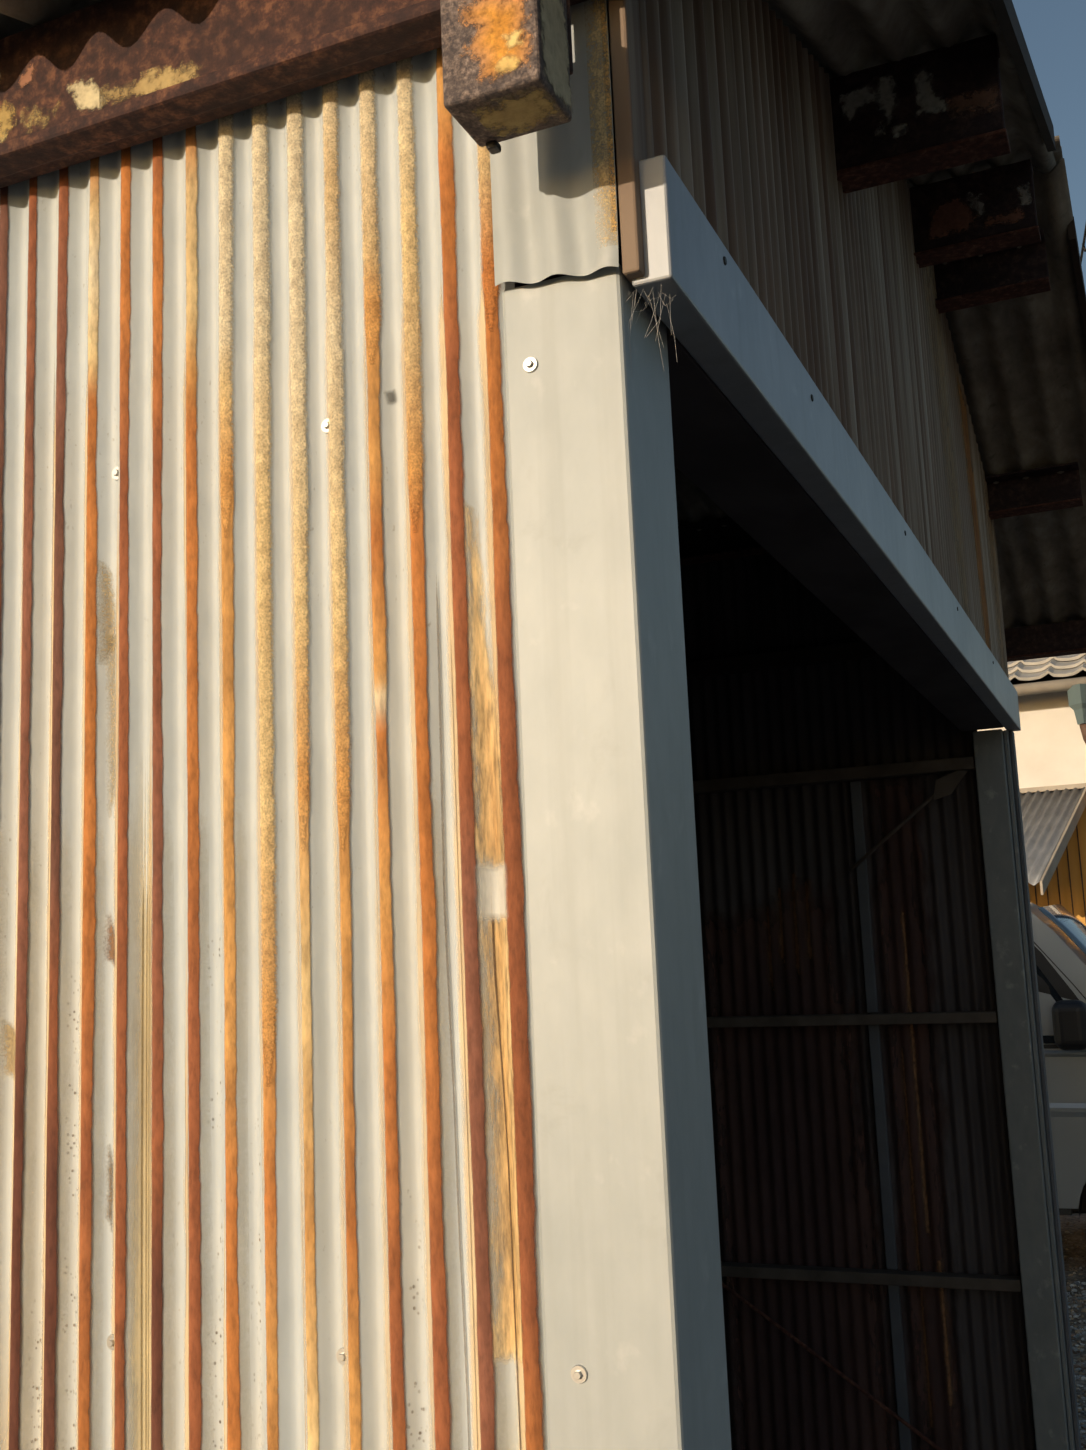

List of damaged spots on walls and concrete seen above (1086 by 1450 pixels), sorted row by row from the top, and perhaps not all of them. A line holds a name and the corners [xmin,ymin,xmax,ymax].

peeling [0,104,46,141]
peeling [19,65,34,87]
rust [8,147,131,1450]
peeling [68,66,196,109]
rust [149,137,164,1450]
rust [184,114,241,1450]
rust [252,104,279,1450]
rust [286,93,319,1450]
rust [322,81,362,1450]
rust [358,57,451,1450]
rust [436,47,544,1450]
peeling [840,70,999,137]